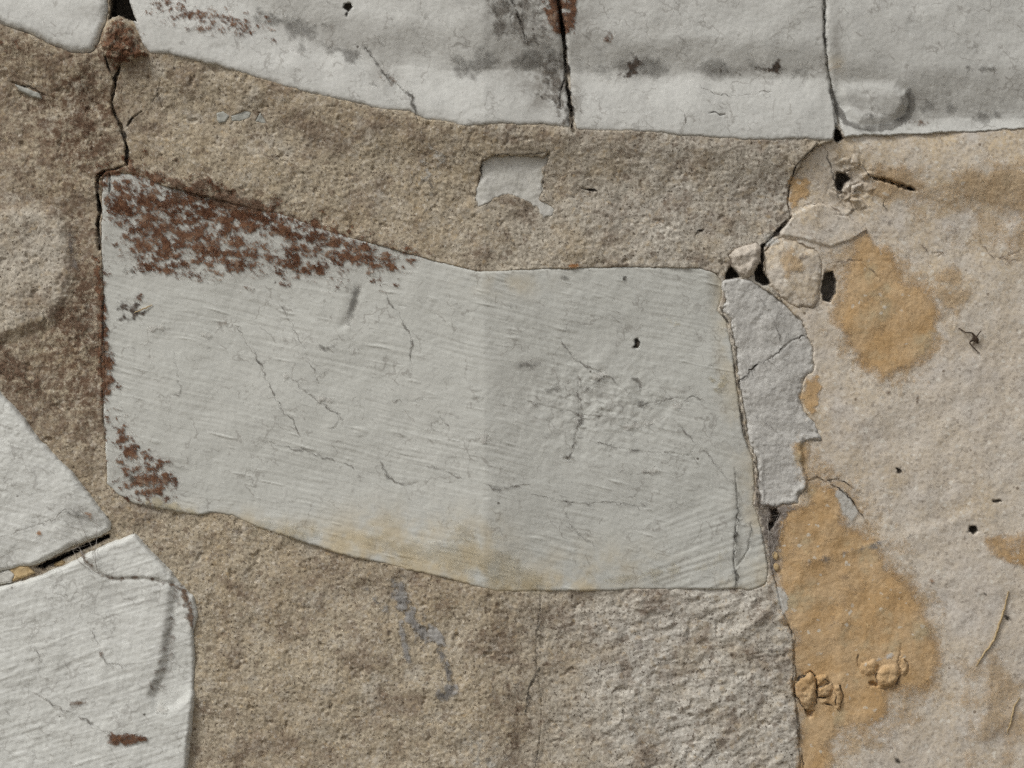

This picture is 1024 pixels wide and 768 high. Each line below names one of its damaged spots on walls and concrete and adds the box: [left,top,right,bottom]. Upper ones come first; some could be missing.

corrosion [542,0,577,40]
crack [557,0,574,131]
crack [95,57,162,249]
flaking render [475,155,554,218]
peeling [867,162,1024,249]
corrosion [48,70,419,508]
peeling [830,233,968,387]
peeling [800,375,822,414]
spalling [0,566,35,585]
peeling [775,443,942,768]
peeling [985,534,1024,565]